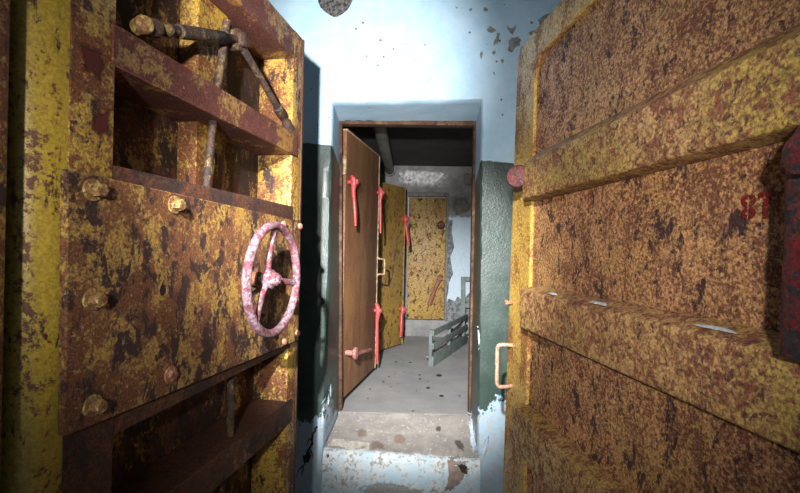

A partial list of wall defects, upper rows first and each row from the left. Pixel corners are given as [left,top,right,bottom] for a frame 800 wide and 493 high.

flaking render [318,0,352,17]
peeling [480,25,521,64]
crack [296,426,318,477]
spalling [444,412,489,492]